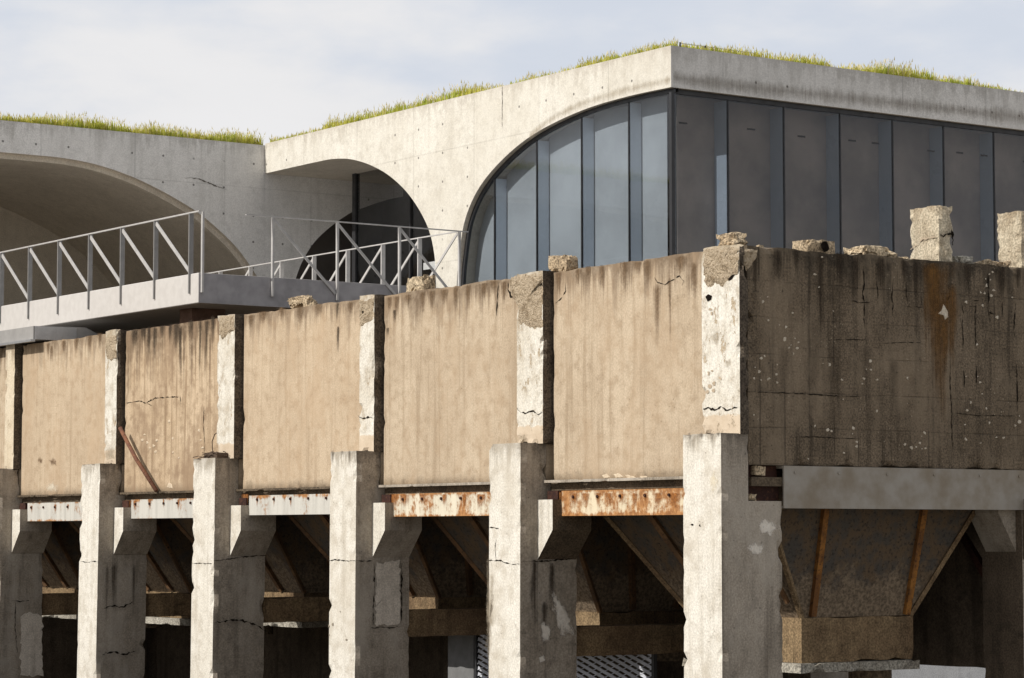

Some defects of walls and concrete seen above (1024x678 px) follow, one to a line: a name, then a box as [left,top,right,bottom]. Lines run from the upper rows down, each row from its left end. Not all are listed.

leakage [388,281,506,317]
spalling [509,273,543,329]
spalling [703,247,758,315]
leakage [132,317,214,359]
crack [704,391,860,411]
rust [555,492,680,504]
crack [213,619,265,631]